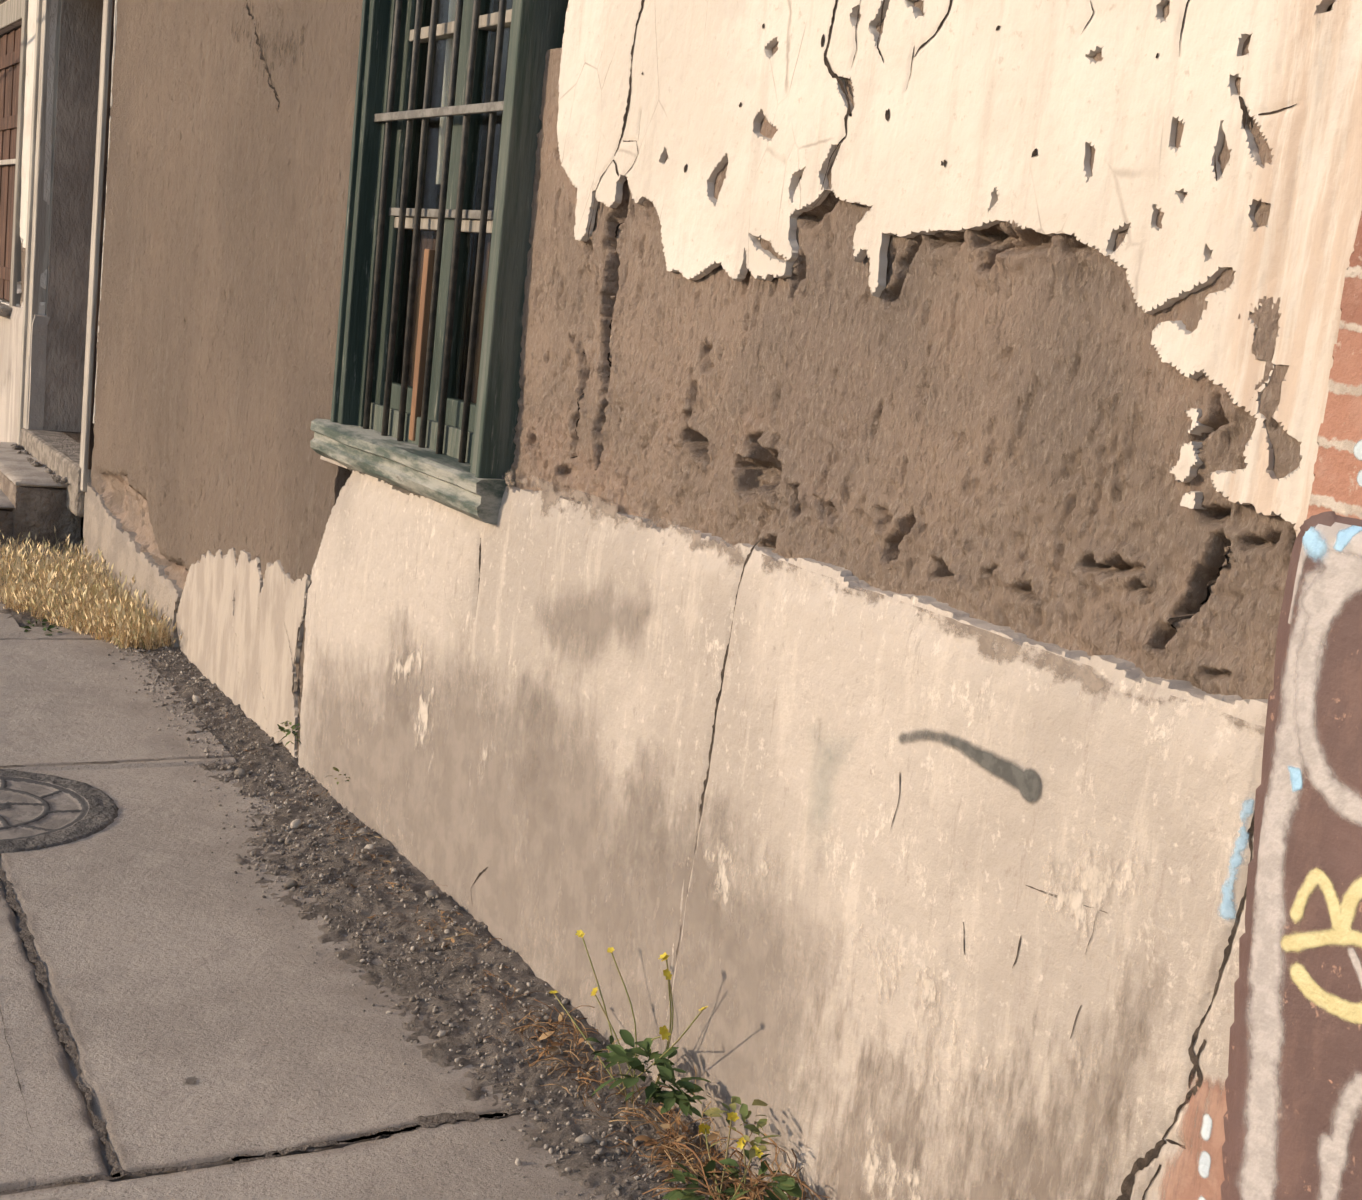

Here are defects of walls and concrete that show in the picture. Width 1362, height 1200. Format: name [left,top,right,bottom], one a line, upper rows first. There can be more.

crack [586,0,644,245]
crack [821,0,952,190]
flaking render [1242,36,1251,56]
crack [572,320,612,470]
spalling [502,48,1302,699]
peeling [100,472,311,759]
crack [292,582,312,758]
crack [687,538,761,892]
crack [1116,810,1255,1200]